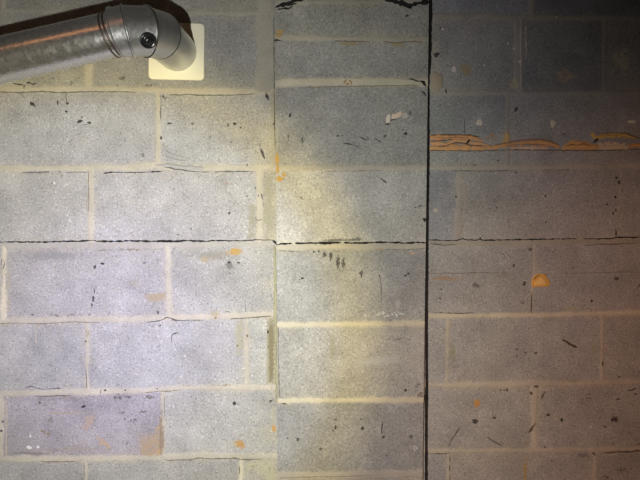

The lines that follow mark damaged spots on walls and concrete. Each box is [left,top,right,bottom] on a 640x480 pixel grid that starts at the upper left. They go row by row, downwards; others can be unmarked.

spalling [385,111,414,125]
crack [0,237,261,245]
crack [273,0,640,480]
corrosion [531,274,550,288]